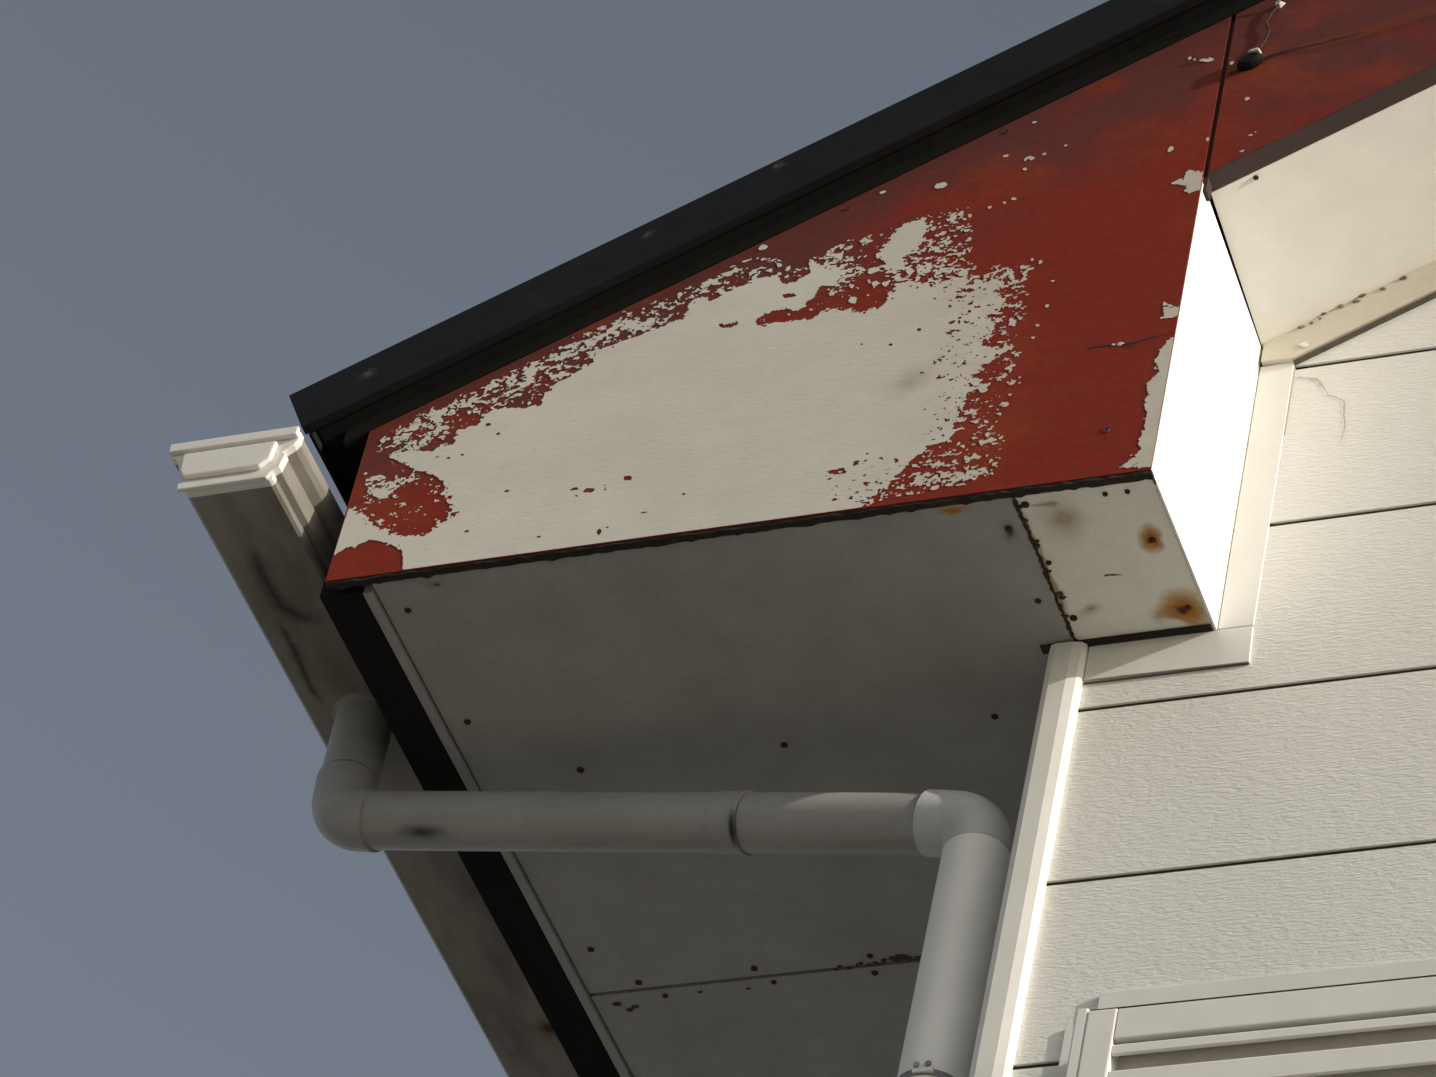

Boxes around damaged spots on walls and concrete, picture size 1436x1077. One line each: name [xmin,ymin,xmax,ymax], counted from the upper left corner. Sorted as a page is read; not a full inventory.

peeling [1171,170,1203,193]
peeling [1160,302,1179,319]
peeling [334,207,1042,570]
peeling [1119,337,1174,468]
rust [1142,529,1162,549]
rust [1158,595,1204,624]